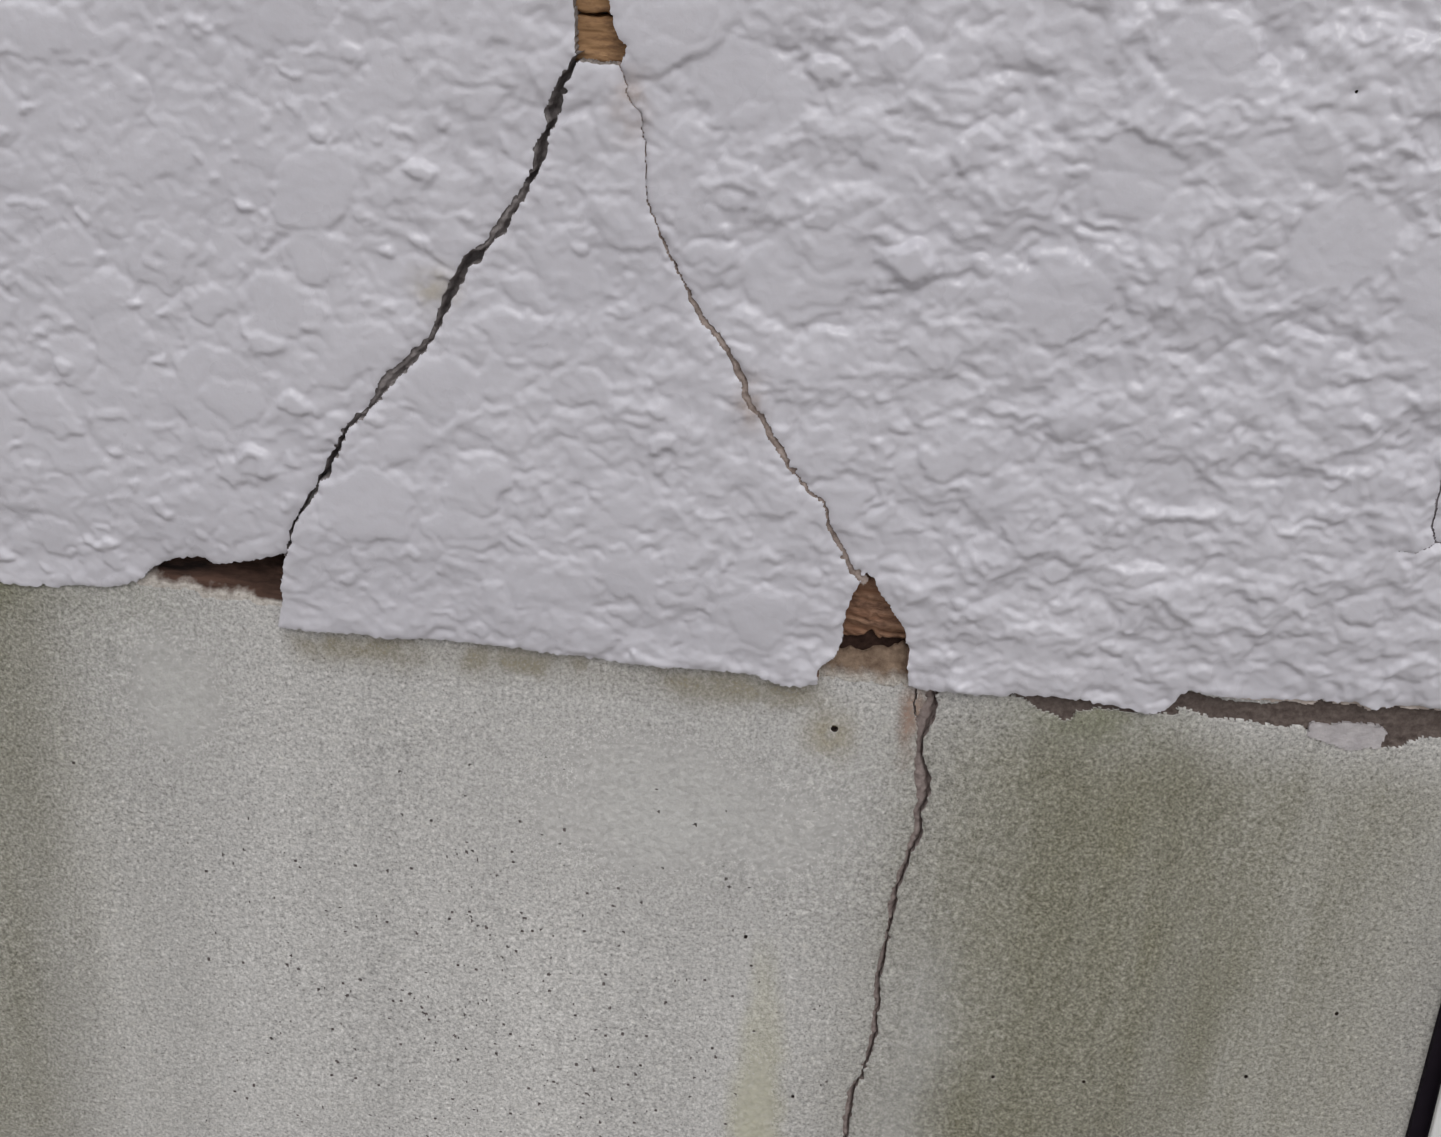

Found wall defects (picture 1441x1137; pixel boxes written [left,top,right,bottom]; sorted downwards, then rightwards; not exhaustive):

spalling [573,0,627,65]
crack [284,50,585,556]
crack [618,62,868,585]
spalling [137,553,285,607]
spalling [817,573,910,687]
peeling [1009,691,1441,751]
crack [842,689,939,1137]